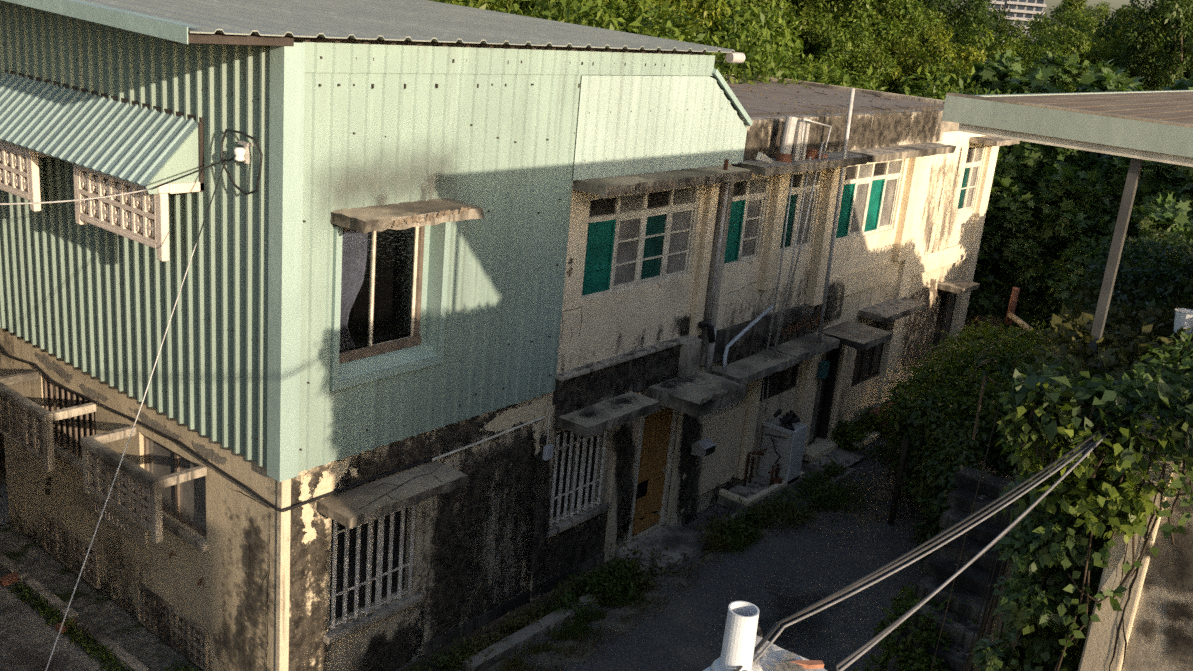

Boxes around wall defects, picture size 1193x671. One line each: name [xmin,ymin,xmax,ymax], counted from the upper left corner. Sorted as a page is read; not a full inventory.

water stain [743,104,940,161]
water stain [922,149,962,252]
water stain [175,315,703,671]
water stain [8,511,146,621]
water stain [1142,501,1193,670]